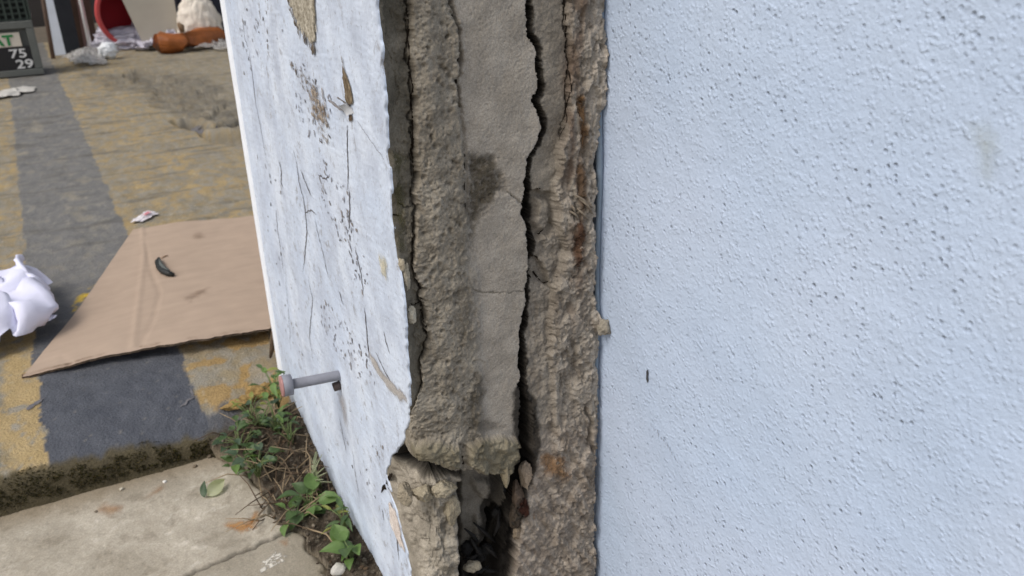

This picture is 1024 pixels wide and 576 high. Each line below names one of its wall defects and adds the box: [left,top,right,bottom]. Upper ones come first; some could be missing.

peeling [282,0,354,143]
crack [406,0,414,176]
corrosion [577,95,589,148]
crack [242,17,390,380]
crack [392,214,427,352]
spalling [372,0,609,576]
crack [470,0,572,484]
corrosion [574,166,586,268]
crack [339,419,399,558]
crack [466,502,515,576]